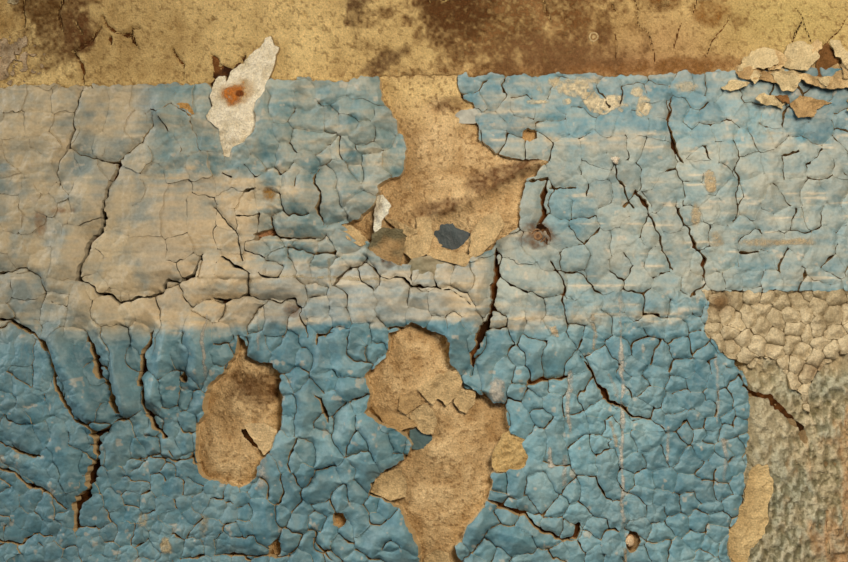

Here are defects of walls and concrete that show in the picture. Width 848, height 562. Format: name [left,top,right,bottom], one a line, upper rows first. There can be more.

peeling [0,36,41,81]
leakage [21,0,94,60]
leakage [413,0,646,75]
corrosion [224,82,246,105]
crack [538,178,548,224]
peeling [0,54,598,562]
crack [471,250,501,367]
peeling [455,39,848,562]
crack [586,363,650,419]
crack [747,389,804,431]
crack [77,418,130,526]
crack [491,500,580,540]